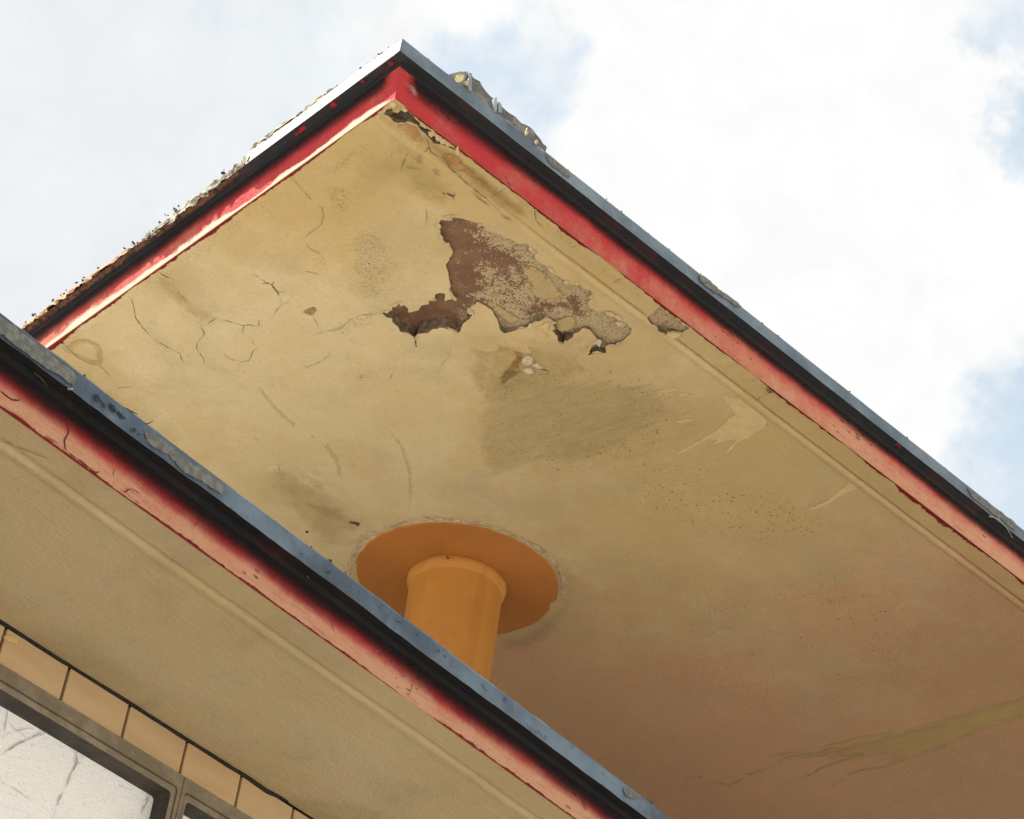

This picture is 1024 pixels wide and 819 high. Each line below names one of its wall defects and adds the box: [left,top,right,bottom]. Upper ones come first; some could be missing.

spalling [383,102,465,171]
spalling [382,215,632,355]
crack [132,275,291,367]
spalling [647,307,689,339]
peeling [522,355,543,374]